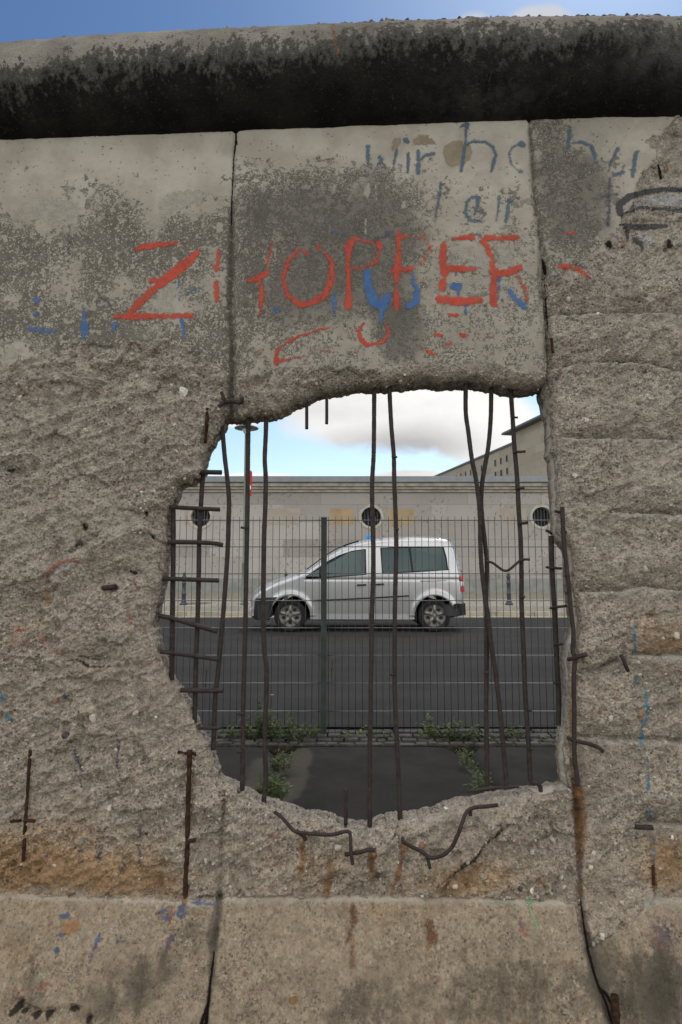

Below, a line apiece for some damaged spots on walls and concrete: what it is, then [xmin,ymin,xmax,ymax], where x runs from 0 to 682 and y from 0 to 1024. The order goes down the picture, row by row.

crack [230,133,238,225]
spalling [233,115,682,947]
spalling [0,324,605,951]
corrosion [569,710,586,863]
crack [438,830,502,887]
crack [200,952,215,1024]
crack [580,899,612,1024]